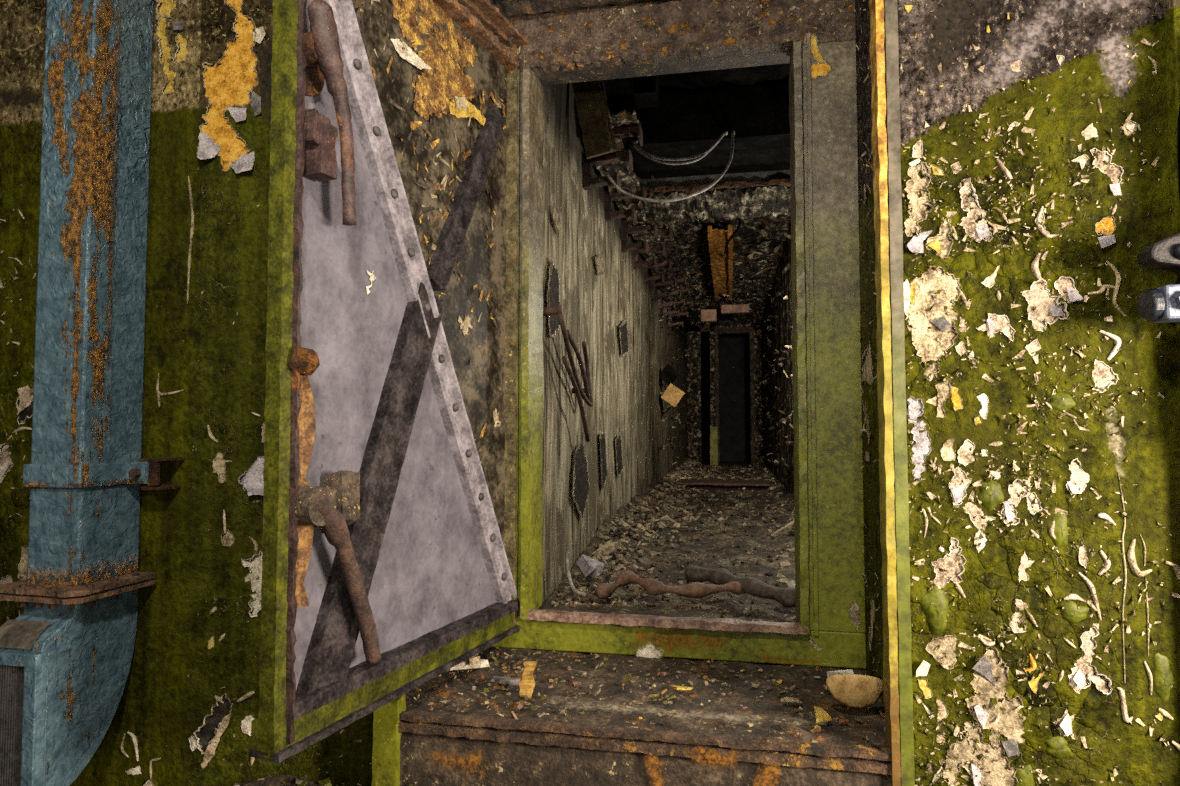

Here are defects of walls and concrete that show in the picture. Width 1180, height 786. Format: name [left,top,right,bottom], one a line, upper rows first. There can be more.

peeling [197,0,266,173]
peeling [390,39,486,126]
peeling [902,106,1083,598]
peeling [1090,330,1121,395]
peeling [207,412,265,496]
peeling [1062,455,1099,496]
peeling [219,509,262,620]
peeling [1076,543,1111,576]
peeling [1008,597,1038,634]
peeling [1059,623,1115,696]
peeling [916,631,1045,786]
peeling [1051,707,1077,741]